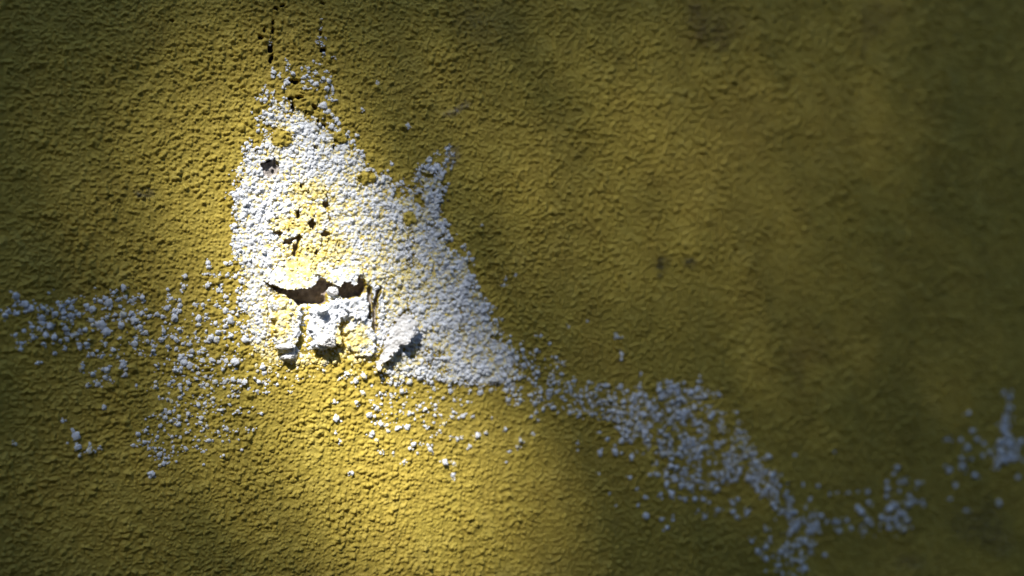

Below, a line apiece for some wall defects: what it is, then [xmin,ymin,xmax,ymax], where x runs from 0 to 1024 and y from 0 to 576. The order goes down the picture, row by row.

flaking render [264,232,419,372]
damp [0,58,853,576]
damp [828,465,925,537]
damp [943,390,1024,501]